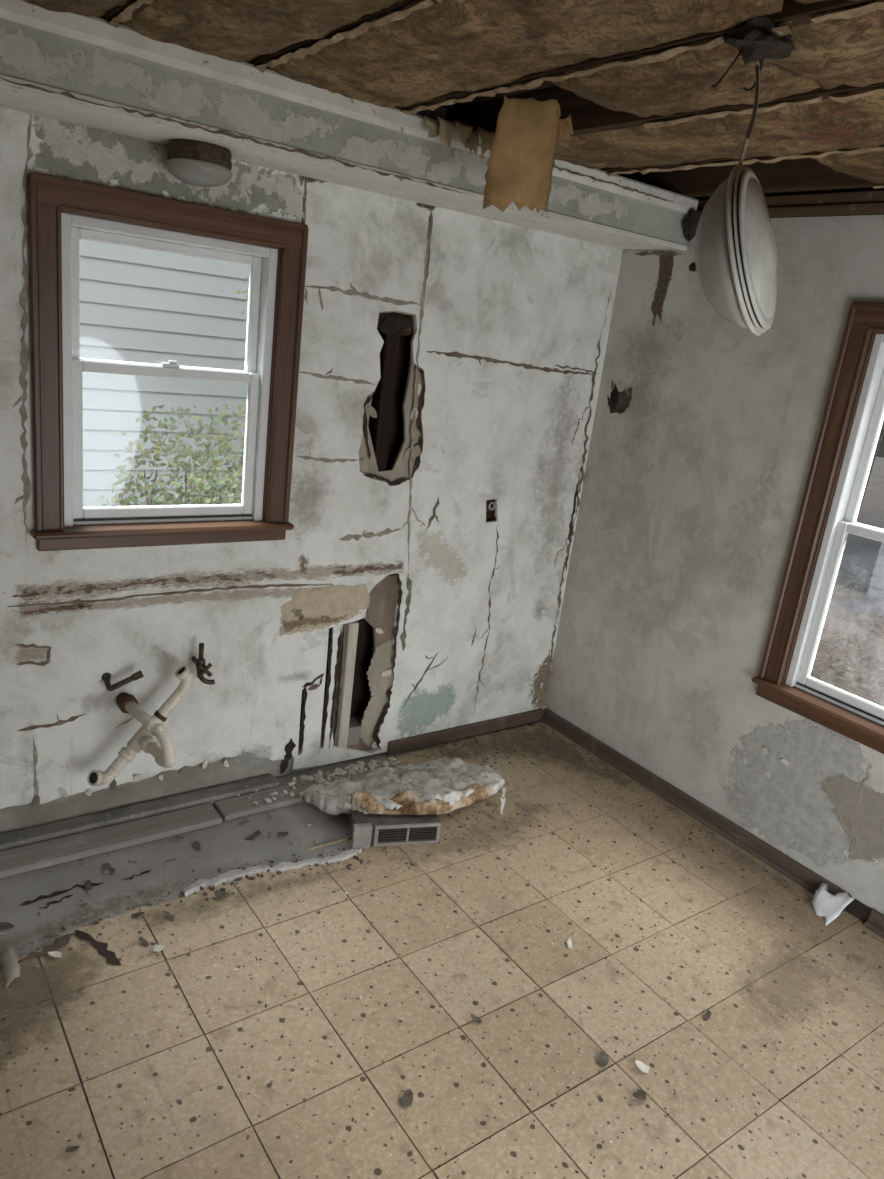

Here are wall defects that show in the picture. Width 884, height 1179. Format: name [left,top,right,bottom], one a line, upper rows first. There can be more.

peeling [26,113,306,223]
crack [553,165,675,203]
crack [0,77,611,714]
spalling [359,311,425,486]
spalling [607,380,632,414]
spalling [280,573,403,774]
spalling [723,719,884,912]